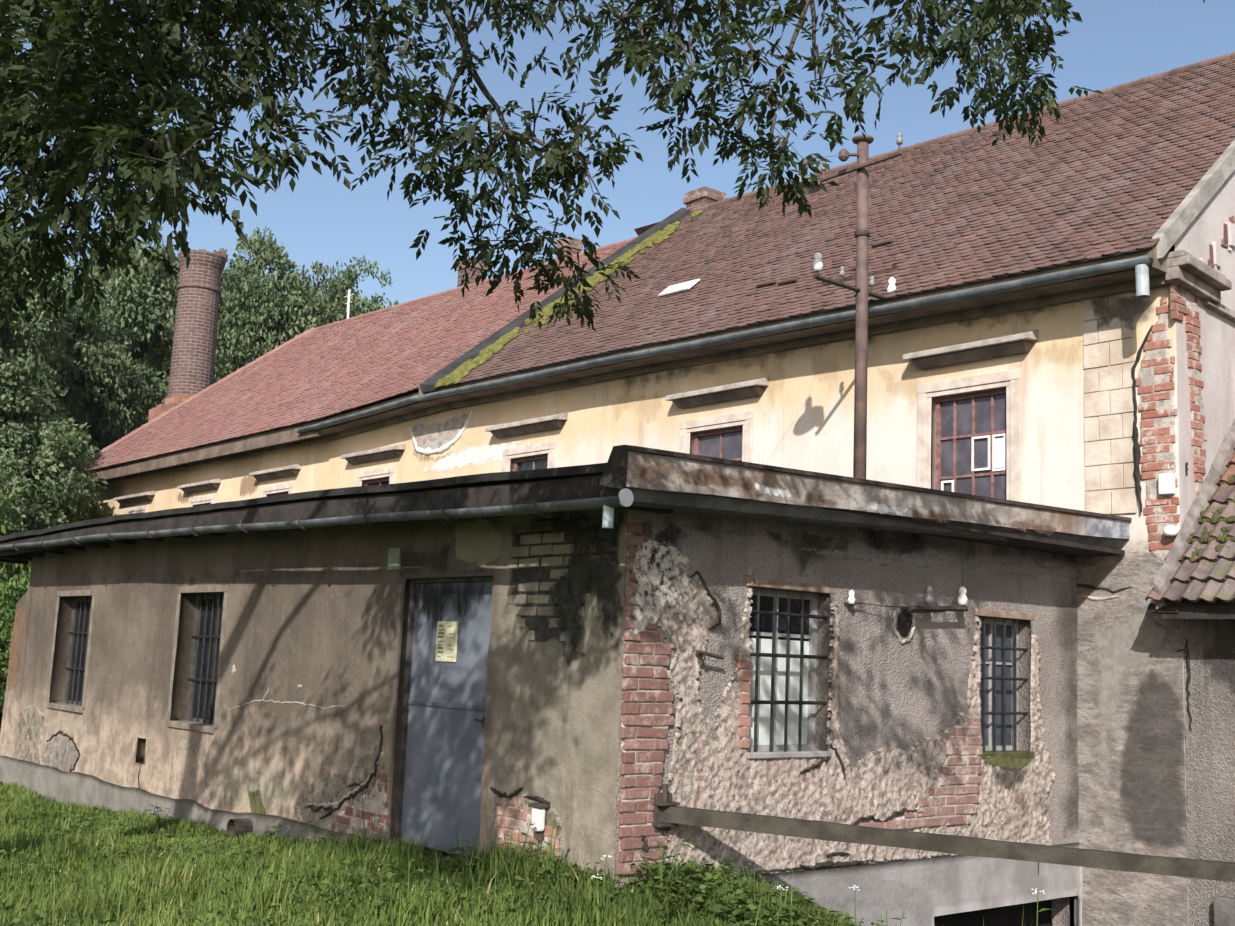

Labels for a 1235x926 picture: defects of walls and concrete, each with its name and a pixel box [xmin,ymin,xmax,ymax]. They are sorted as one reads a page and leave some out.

crack [1131,326,1153,512]
flaking render [1136,282,1207,563]
flaking render [14,703,87,772]
crack [305,726,383,820]
flaking render [492,792,564,863]
flaking render [508,513,1056,875]
leakage [1122,672,1185,847]
crack [1175,639,1192,730]